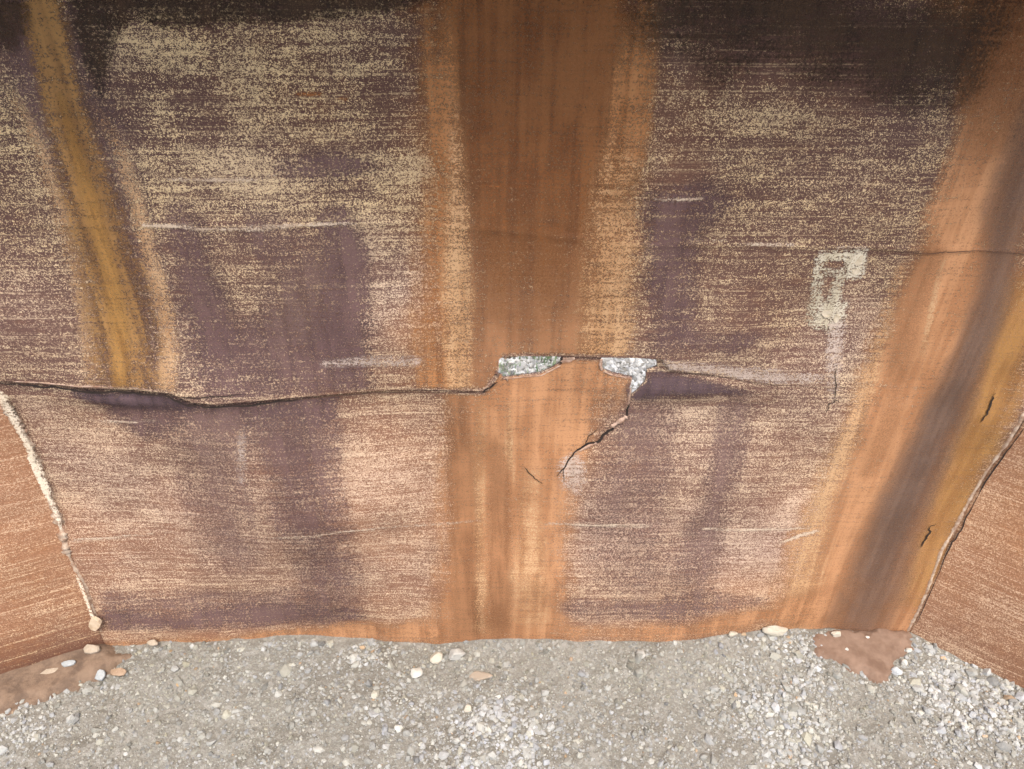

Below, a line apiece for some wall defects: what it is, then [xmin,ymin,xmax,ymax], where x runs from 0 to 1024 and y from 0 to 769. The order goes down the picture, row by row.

rust [0,0,184,393]
leakage [88,202,376,632]
crack [1,381,498,408]
rust [109,0,1024,646]
crack [525,388,632,482]
leakage [562,399,767,640]
leakage [637,178,761,355]
crack [915,430,1023,626]